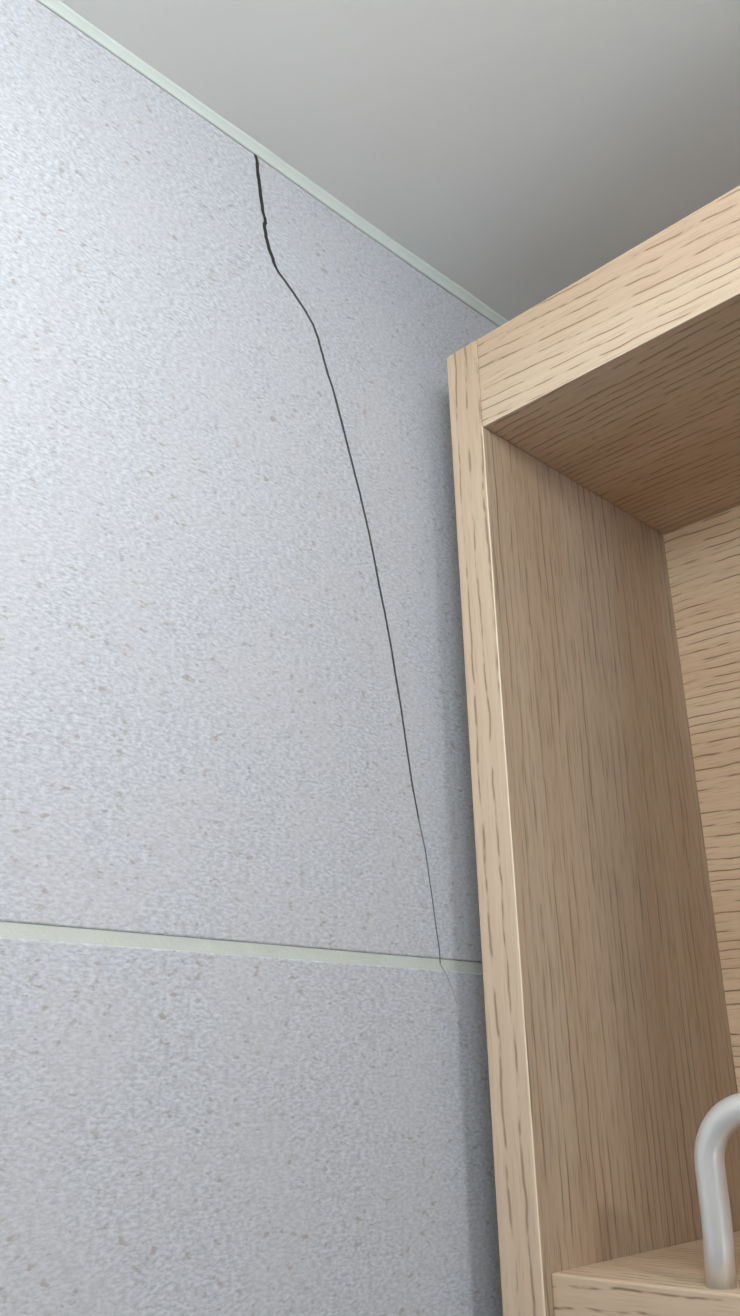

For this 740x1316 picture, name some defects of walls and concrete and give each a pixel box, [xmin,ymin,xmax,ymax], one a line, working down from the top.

crack [254,154,457,1003]